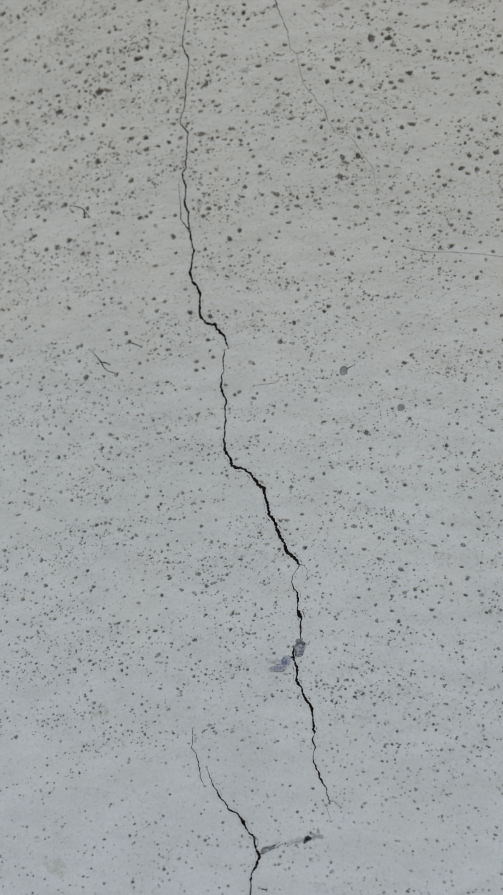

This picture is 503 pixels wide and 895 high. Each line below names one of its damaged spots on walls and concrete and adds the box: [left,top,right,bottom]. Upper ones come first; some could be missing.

crack [273,0,378,193]
crack [177,0,341,821]
crack [190,729,285,895]